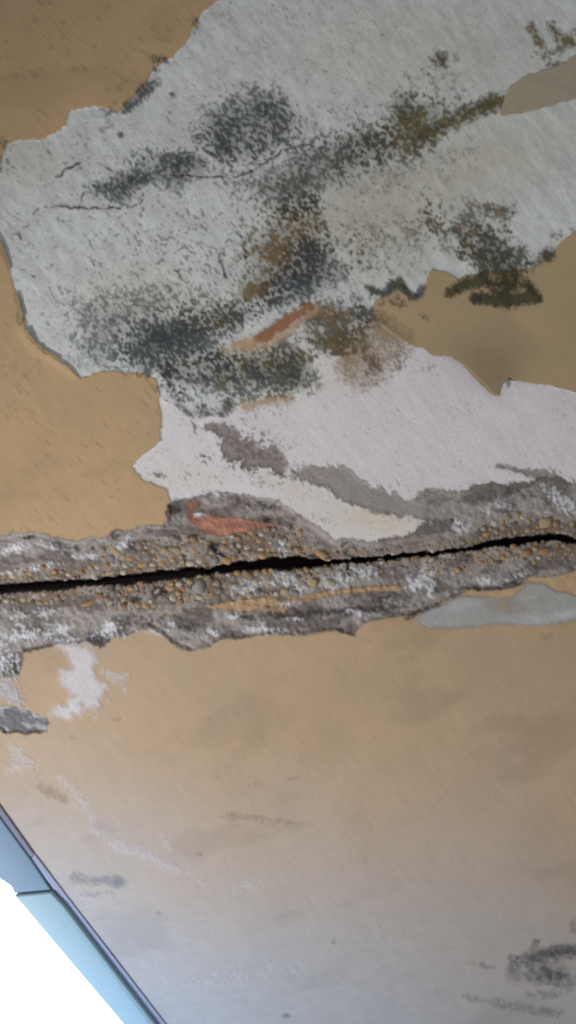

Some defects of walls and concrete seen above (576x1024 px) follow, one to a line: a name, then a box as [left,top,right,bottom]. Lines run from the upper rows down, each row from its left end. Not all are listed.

mould [103,57,168,114]
damp [83,87,505,417]
mould [442,202,555,307]
corrosion [223,302,319,350]
peeling [0,0,576,735]
crack [0,533,576,594]
efflorescence [54,639,105,719]
mould [530,947,576,979]